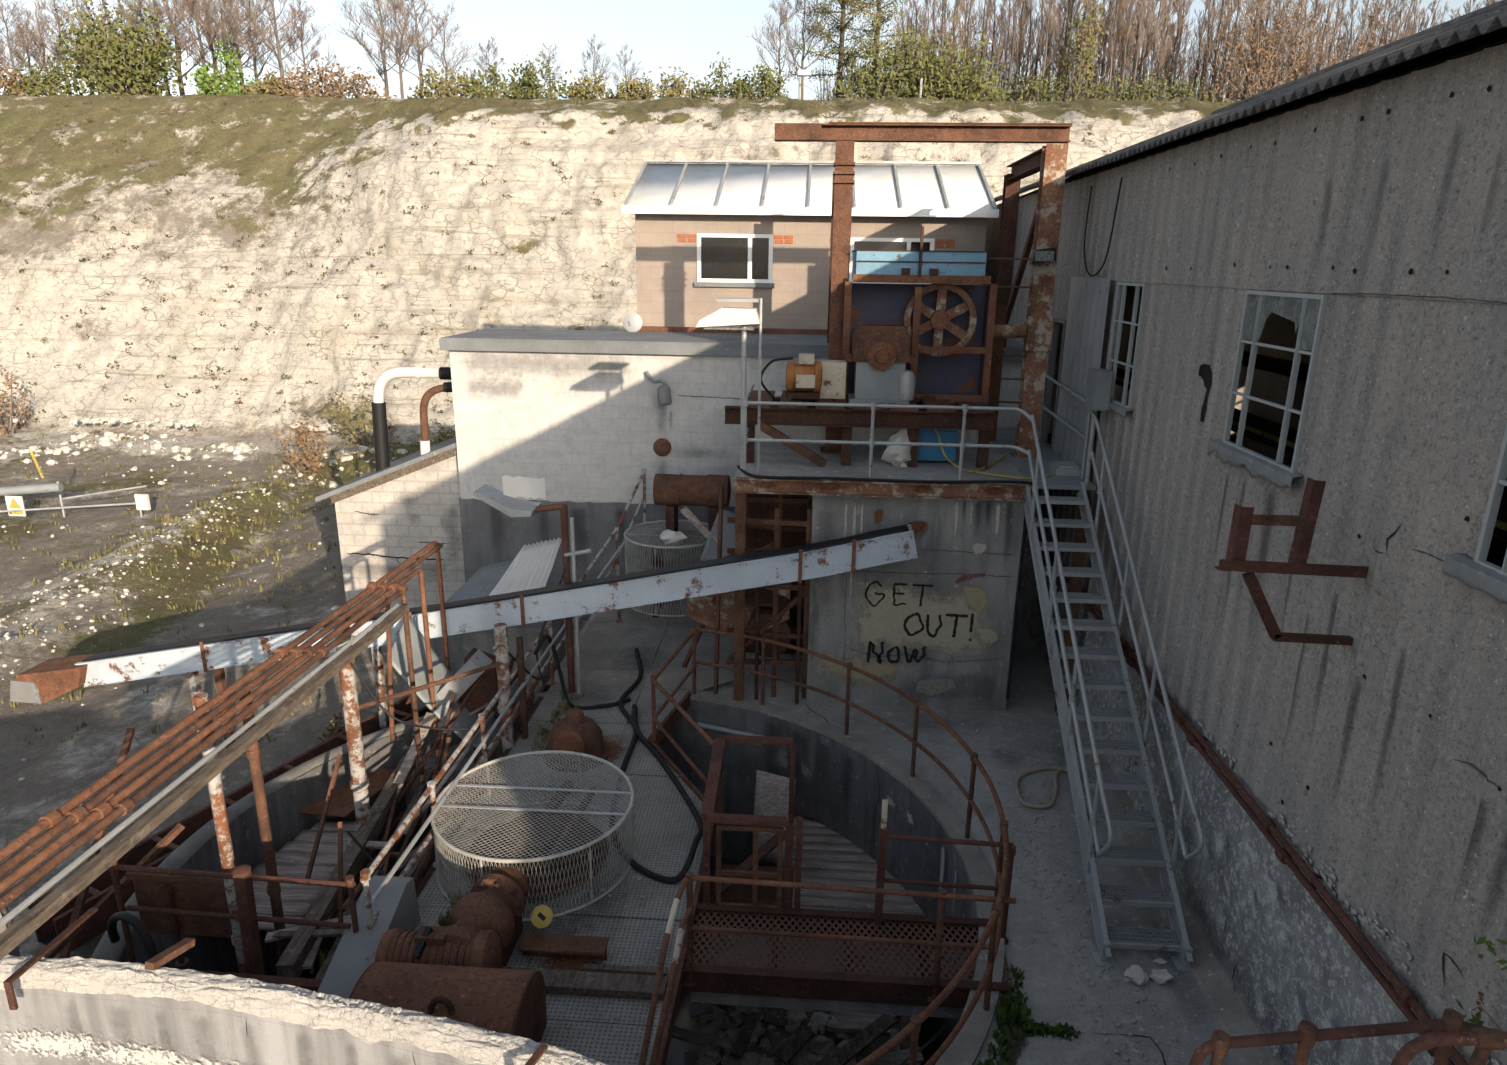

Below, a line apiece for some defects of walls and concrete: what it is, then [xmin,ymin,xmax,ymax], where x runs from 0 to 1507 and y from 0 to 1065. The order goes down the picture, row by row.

crack [1333,283,1507,304]
peeling [854,581,998,657]
crack [1454,759,1499,788]